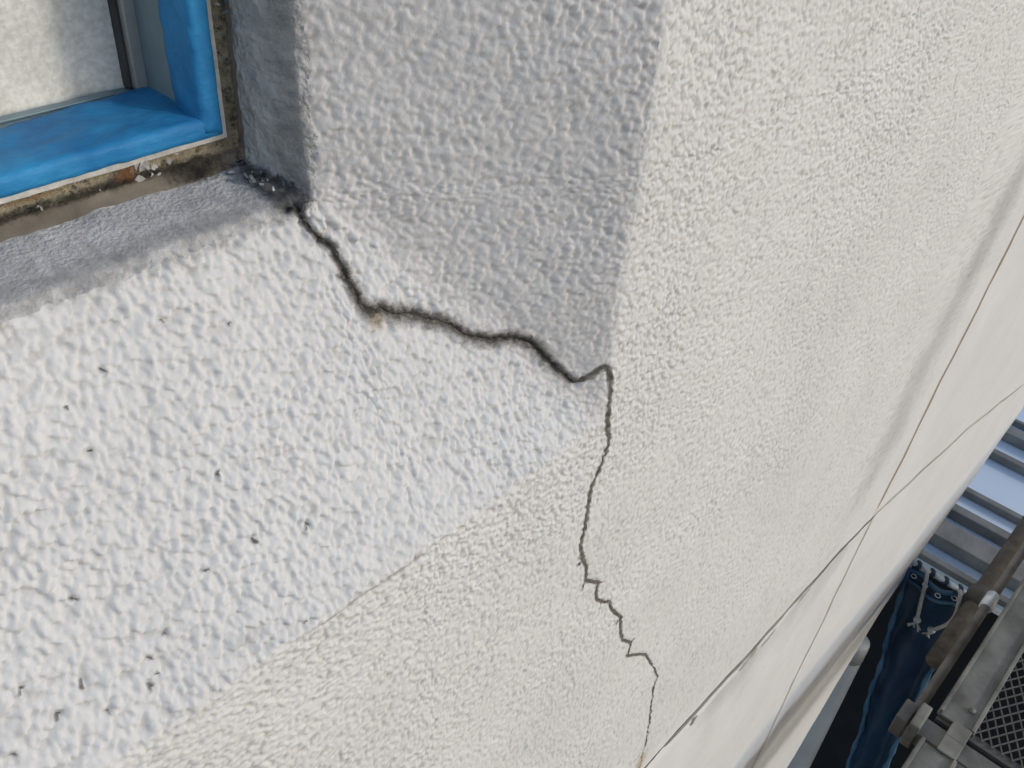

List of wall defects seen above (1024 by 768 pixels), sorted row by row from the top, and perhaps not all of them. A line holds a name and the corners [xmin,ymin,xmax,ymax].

crack [296,209,659,766]